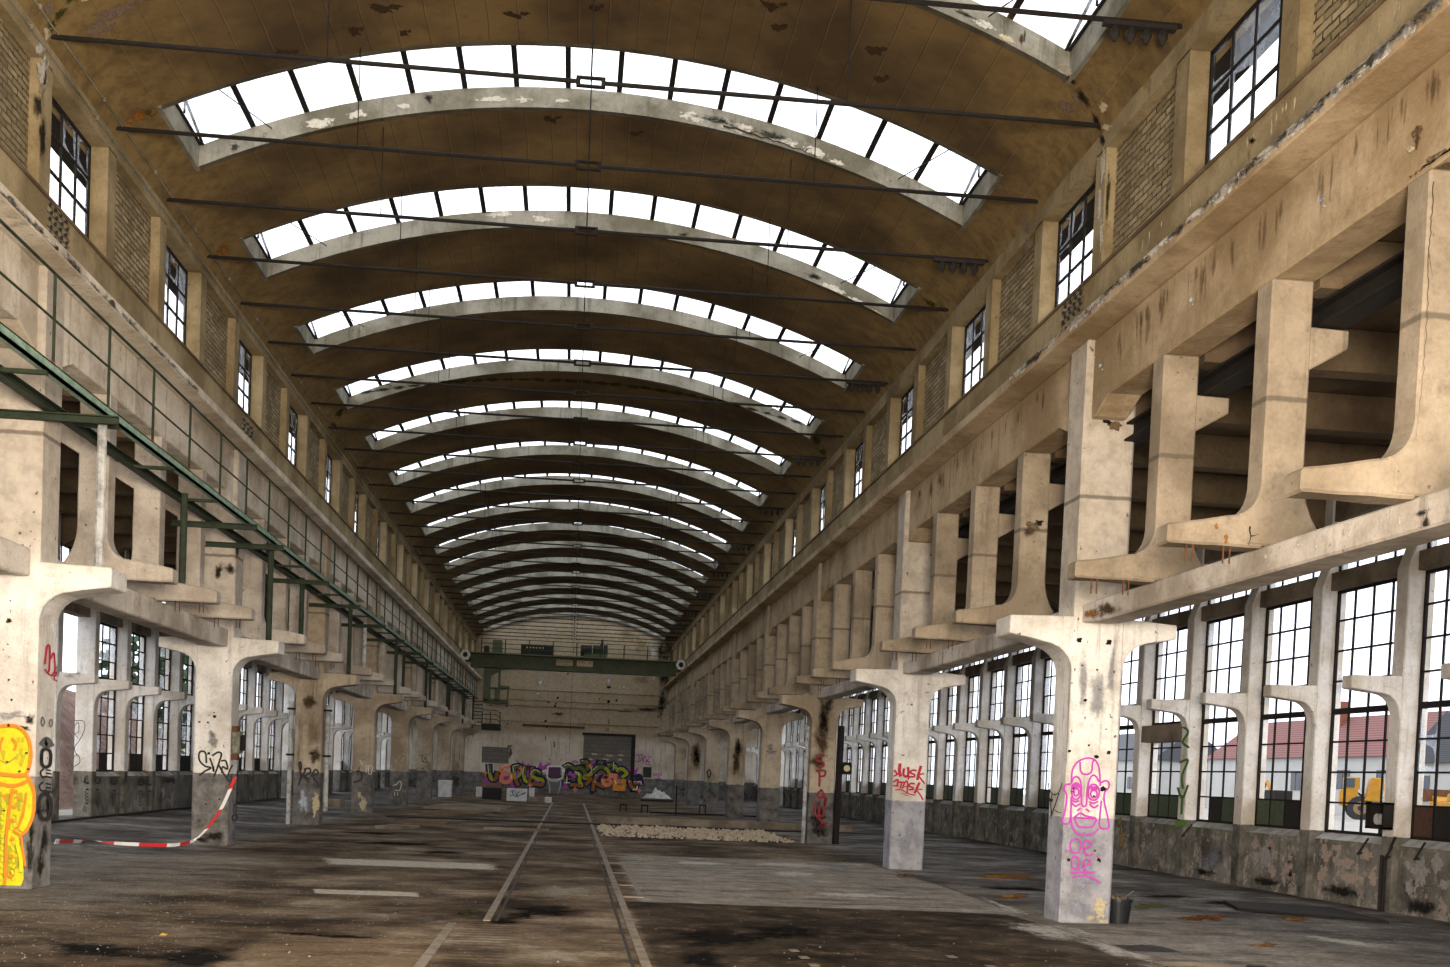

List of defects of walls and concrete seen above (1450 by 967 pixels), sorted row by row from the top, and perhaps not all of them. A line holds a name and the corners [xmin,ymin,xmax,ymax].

peeling [956,9,1016,44]
peeling [680,111,845,166]
water stain [1254,878,1279,886]
water stain [1322,885,1357,897]
water stain [1408,899,1435,914]